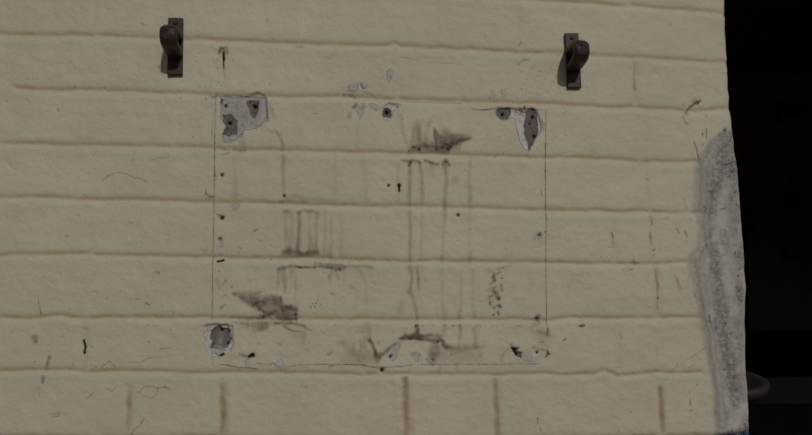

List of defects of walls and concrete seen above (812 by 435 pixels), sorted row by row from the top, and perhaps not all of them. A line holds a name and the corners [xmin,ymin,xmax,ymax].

peeling [220,91,268,143]
peeling [495,106,544,152]
peeling [203,323,255,367]